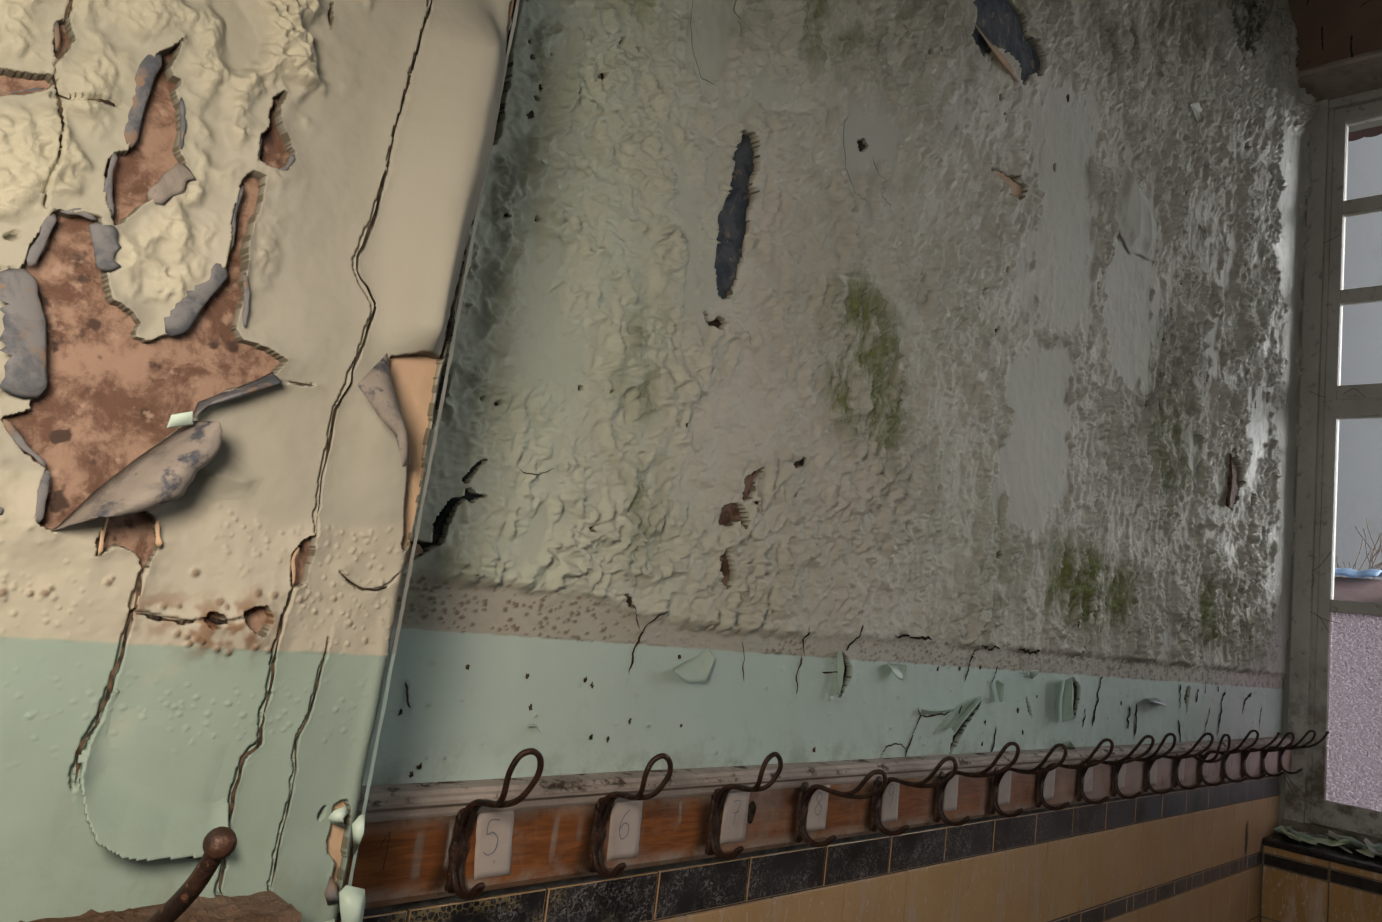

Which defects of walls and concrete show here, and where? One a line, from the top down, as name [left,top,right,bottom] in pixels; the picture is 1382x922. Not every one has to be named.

crack [52,74,115,158]
peeling [971,0,1040,84]
peeling [0,51,295,570]
crack [289,0,432,536]
peeling [714,134,754,299]
mould [845,288,903,446]
peeling [357,354,483,566]
peeling [719,469,760,526]
crack [75,565,227,782]
crack [218,586,330,896]
mould [1048,547,1138,626]
mould [1198,581,1252,641]